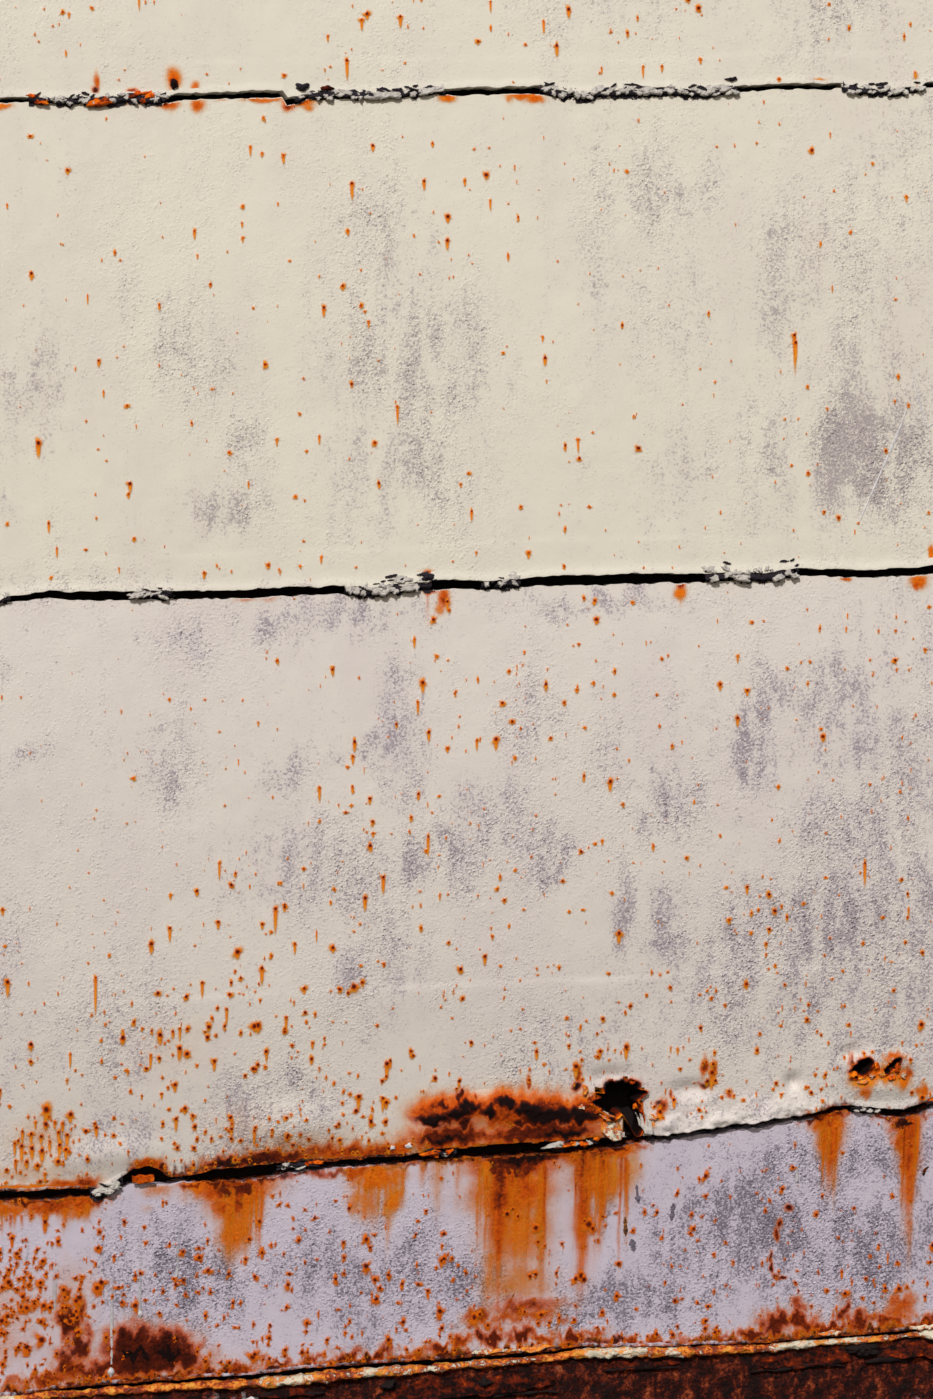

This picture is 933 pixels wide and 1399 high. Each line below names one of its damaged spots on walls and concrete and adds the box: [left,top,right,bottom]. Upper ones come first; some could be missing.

spalling [27,90,171,108]
rust [92,69,137,120]
rust [161,68,208,112]
rust [244,73,313,122]
spalling [294,84,445,107]
spalling [539,82,740,103]
spalling [841,81,927,98]
rust [463,147,538,221]
spalling [701,558,800,584]
rust [308,737,485,869]
rust [0,851,933,1394]
spalling [541,1085,622,1152]